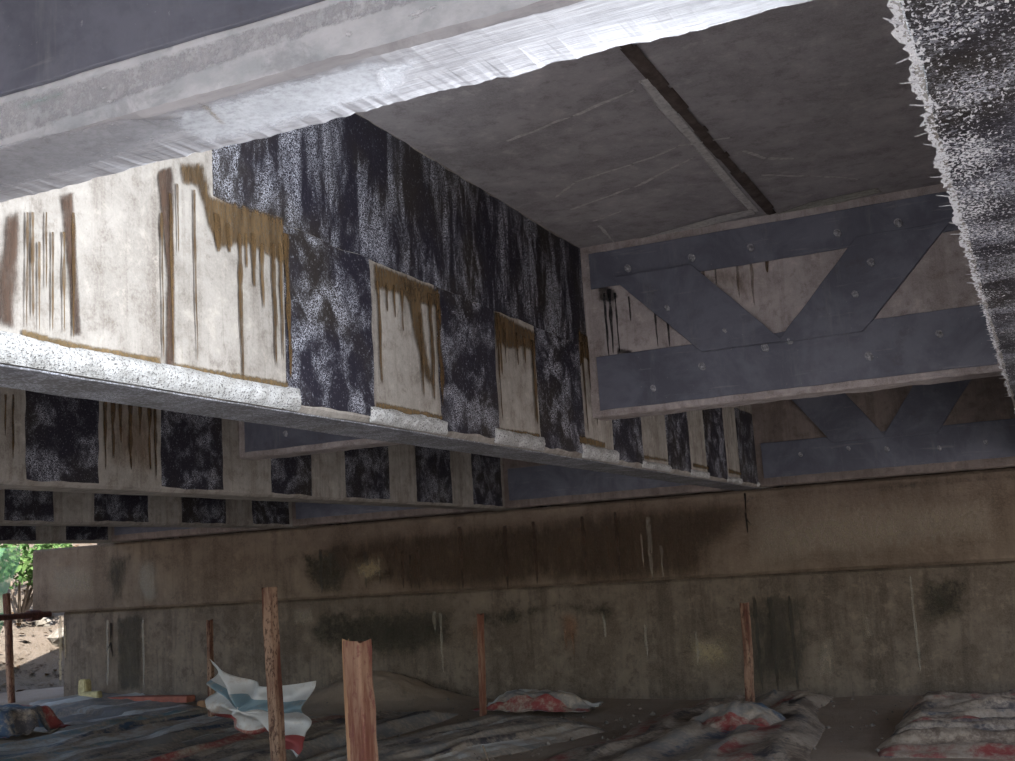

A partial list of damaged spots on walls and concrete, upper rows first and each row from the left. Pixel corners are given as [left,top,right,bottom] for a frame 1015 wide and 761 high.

rust [0,164,292,387]
rust [374,264,445,420]
rust [495,311,540,437]
damp [319,507,735,591]
crack [743,493,751,533]
damp [751,596,803,687]